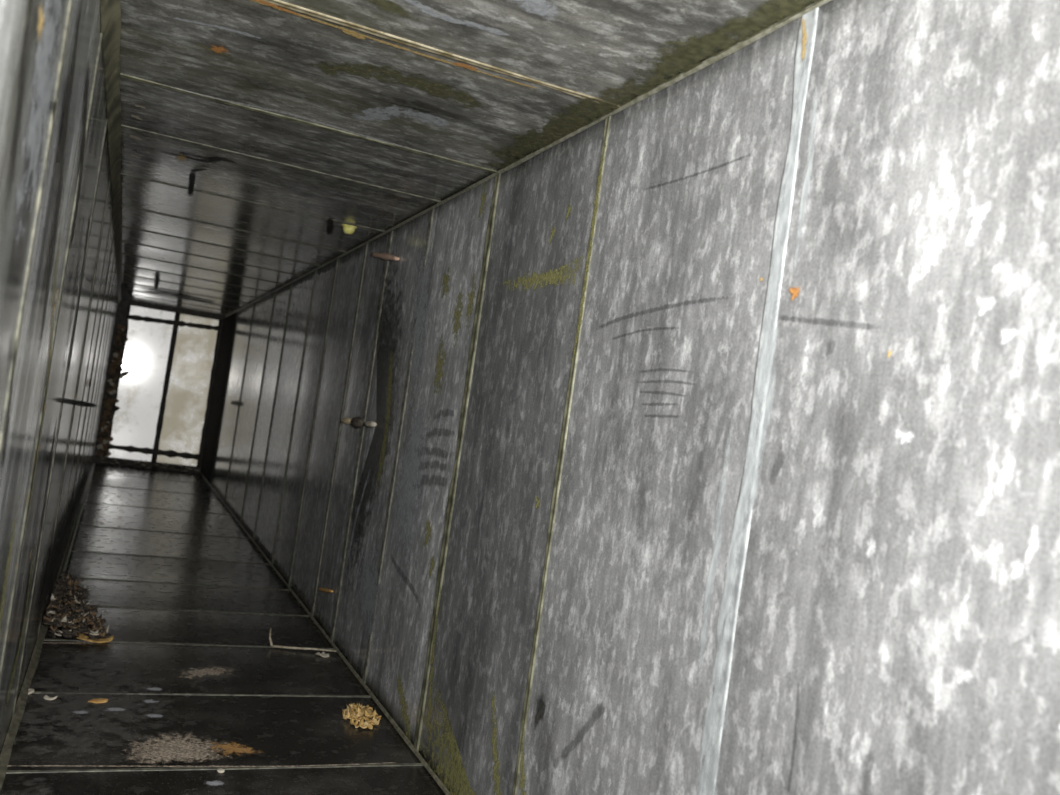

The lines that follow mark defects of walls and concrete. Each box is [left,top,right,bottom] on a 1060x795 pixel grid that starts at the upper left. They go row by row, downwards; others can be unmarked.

leakage [519,699,545,795]
leakage [697,19,817,795]